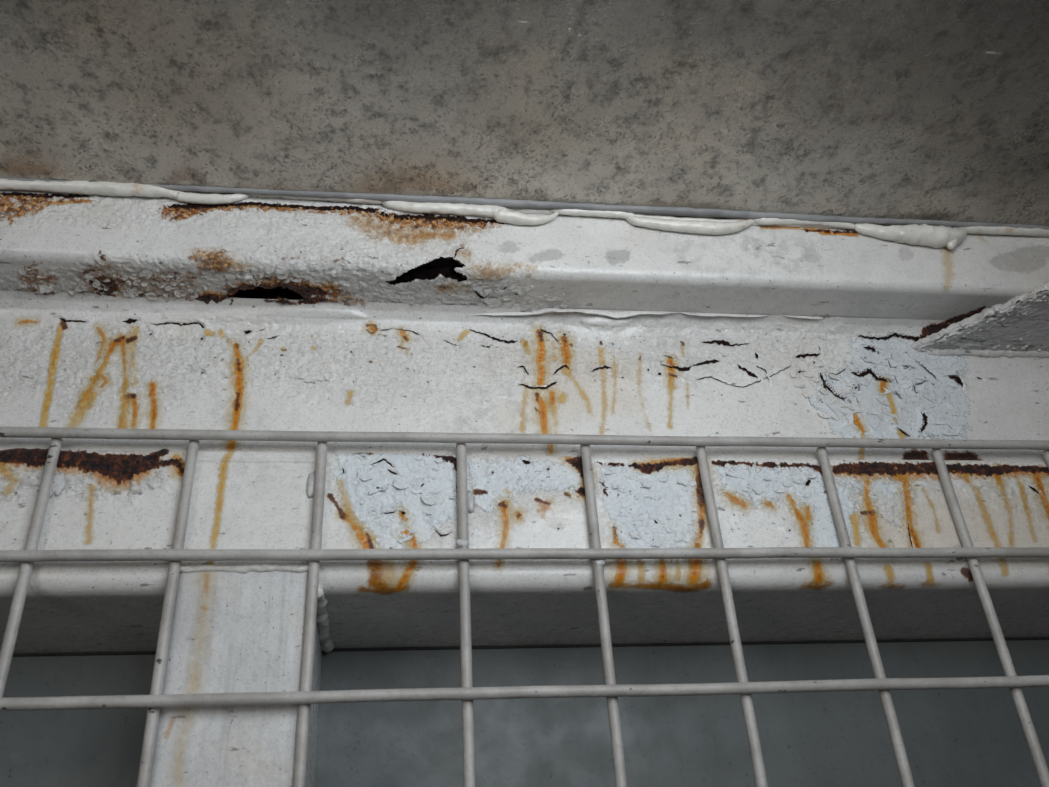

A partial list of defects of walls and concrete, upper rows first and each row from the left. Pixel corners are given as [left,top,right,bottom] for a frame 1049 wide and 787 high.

corrosion [0,192,91,227]
corrosion [159,202,504,242]
spalling [224,261,333,301]
spalling [386,257,467,285]
corrosion [920,306,986,339]
corrosion [521,329,590,454]
crack [662,333,982,437]
peeling [790,331,974,440]
corrosion [327,493,418,594]
peeling [333,453,584,549]
peeling [600,464,700,548]
corrosion [610,527,711,592]